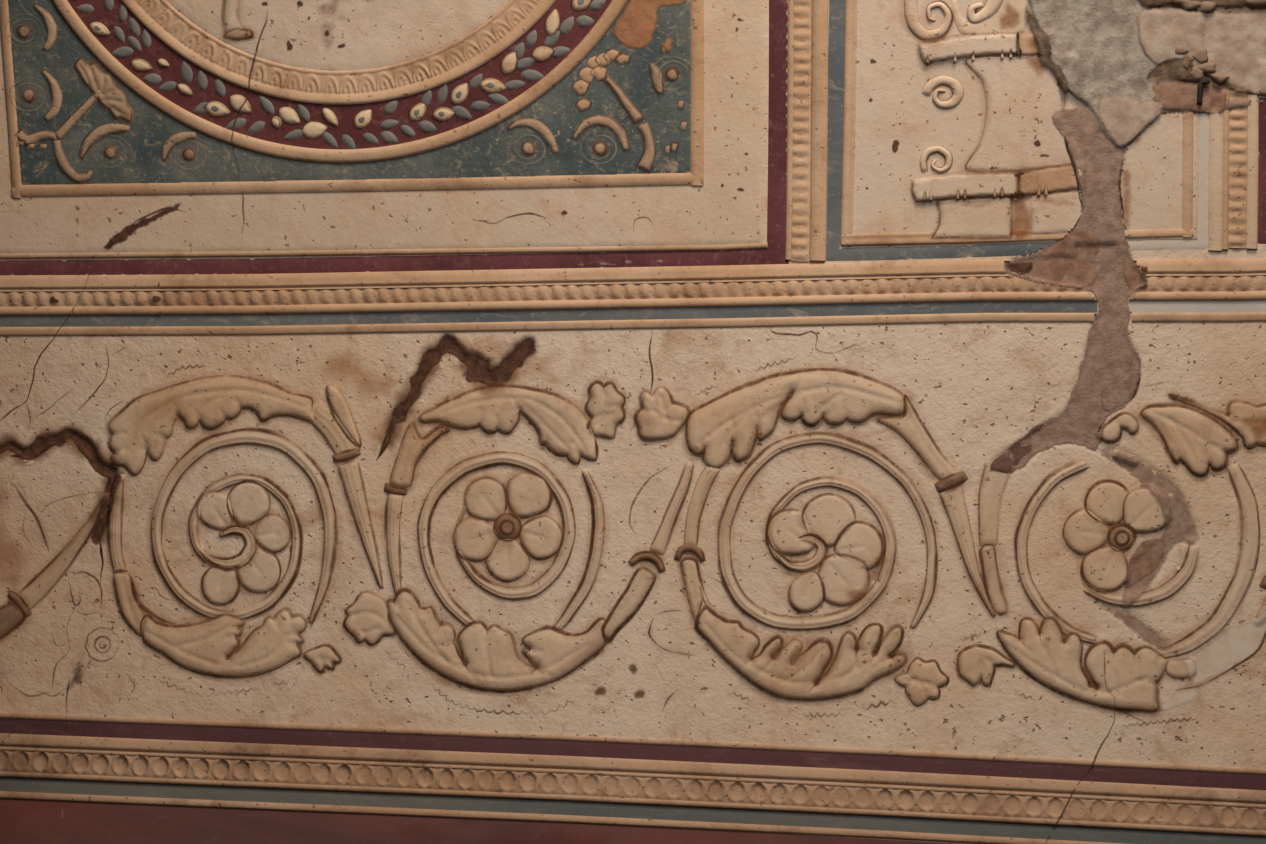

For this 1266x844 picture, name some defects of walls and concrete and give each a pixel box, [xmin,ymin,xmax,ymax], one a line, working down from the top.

peeling [614,0,686,51]
spalling [1140,0,1266,12]
spalling [1152,47,1230,113]
crack [104,204,180,249]
crack [0,314,126,580]
crack [376,335,537,461]
peeling [1161,611,1266,710]
crack [1045,710,1140,843]